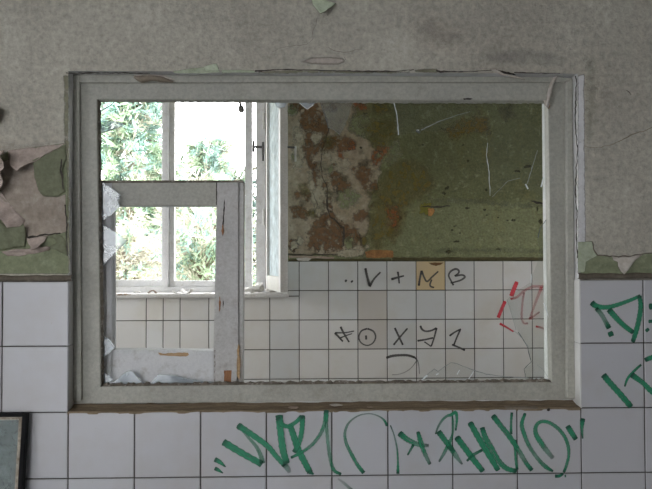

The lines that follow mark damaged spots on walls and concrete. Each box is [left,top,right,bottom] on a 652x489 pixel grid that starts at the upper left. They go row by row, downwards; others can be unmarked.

peeling [0,76,70,274]
crack [288,103,361,256]
spalling [288,103,400,261]
peeling [578,241,652,274]